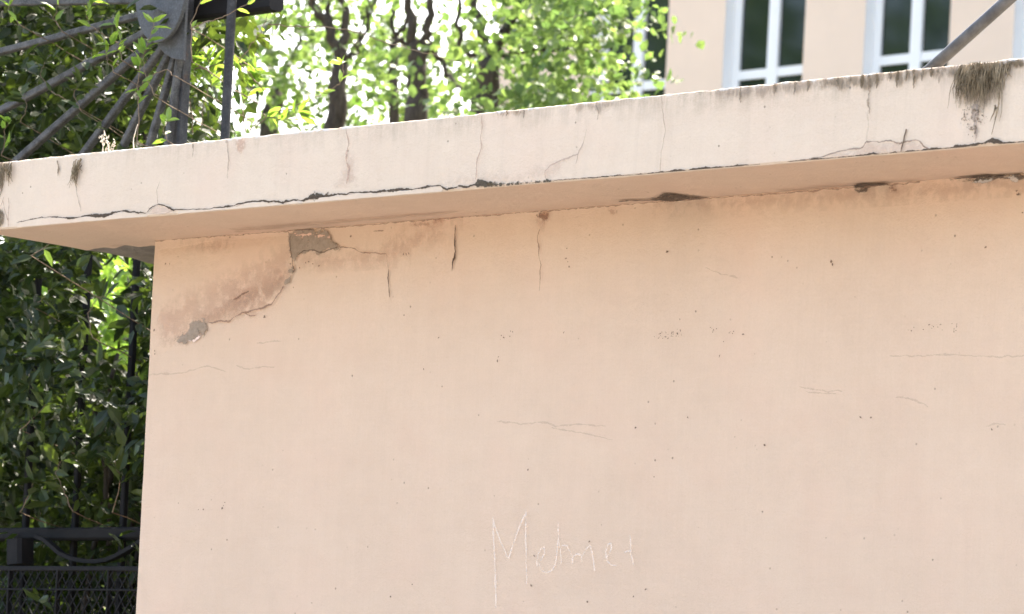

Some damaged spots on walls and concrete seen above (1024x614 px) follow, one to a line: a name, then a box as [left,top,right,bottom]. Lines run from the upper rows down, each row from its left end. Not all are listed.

damp [823,68,955,113]
crack [788,138,1024,162]
crack [556,164,758,181]
crack [17,184,476,228]
peeling [284,228,340,288]
peeling [177,318,208,344]